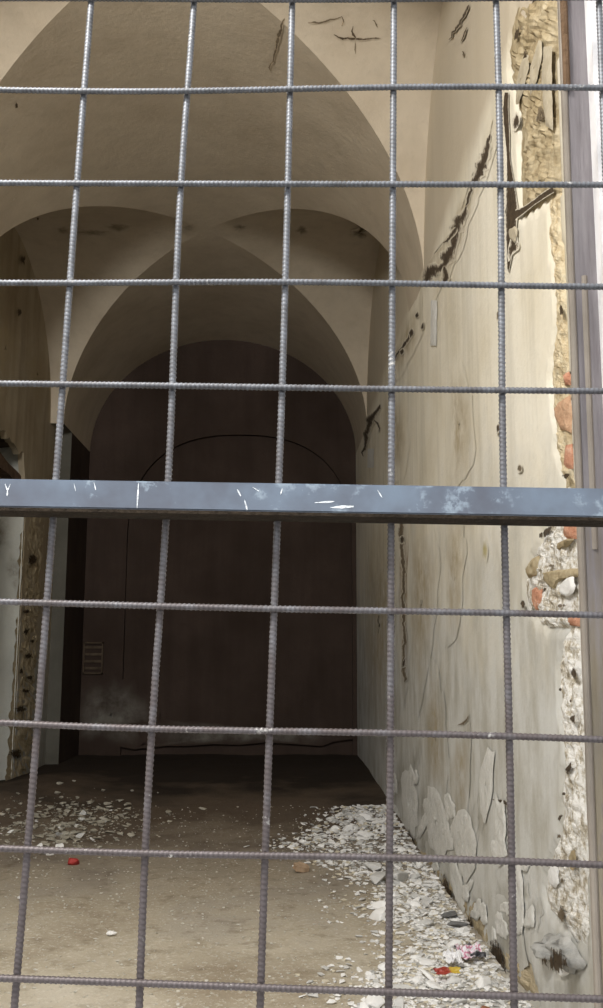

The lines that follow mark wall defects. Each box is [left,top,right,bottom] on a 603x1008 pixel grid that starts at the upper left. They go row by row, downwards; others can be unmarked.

crack [268,16,380,71]
crack [449,5,469,56]
crack [421,92,554,282]
flaking render [510,0,575,488]
flaking render [520,526,590,946]
peeling [393,747,569,993]